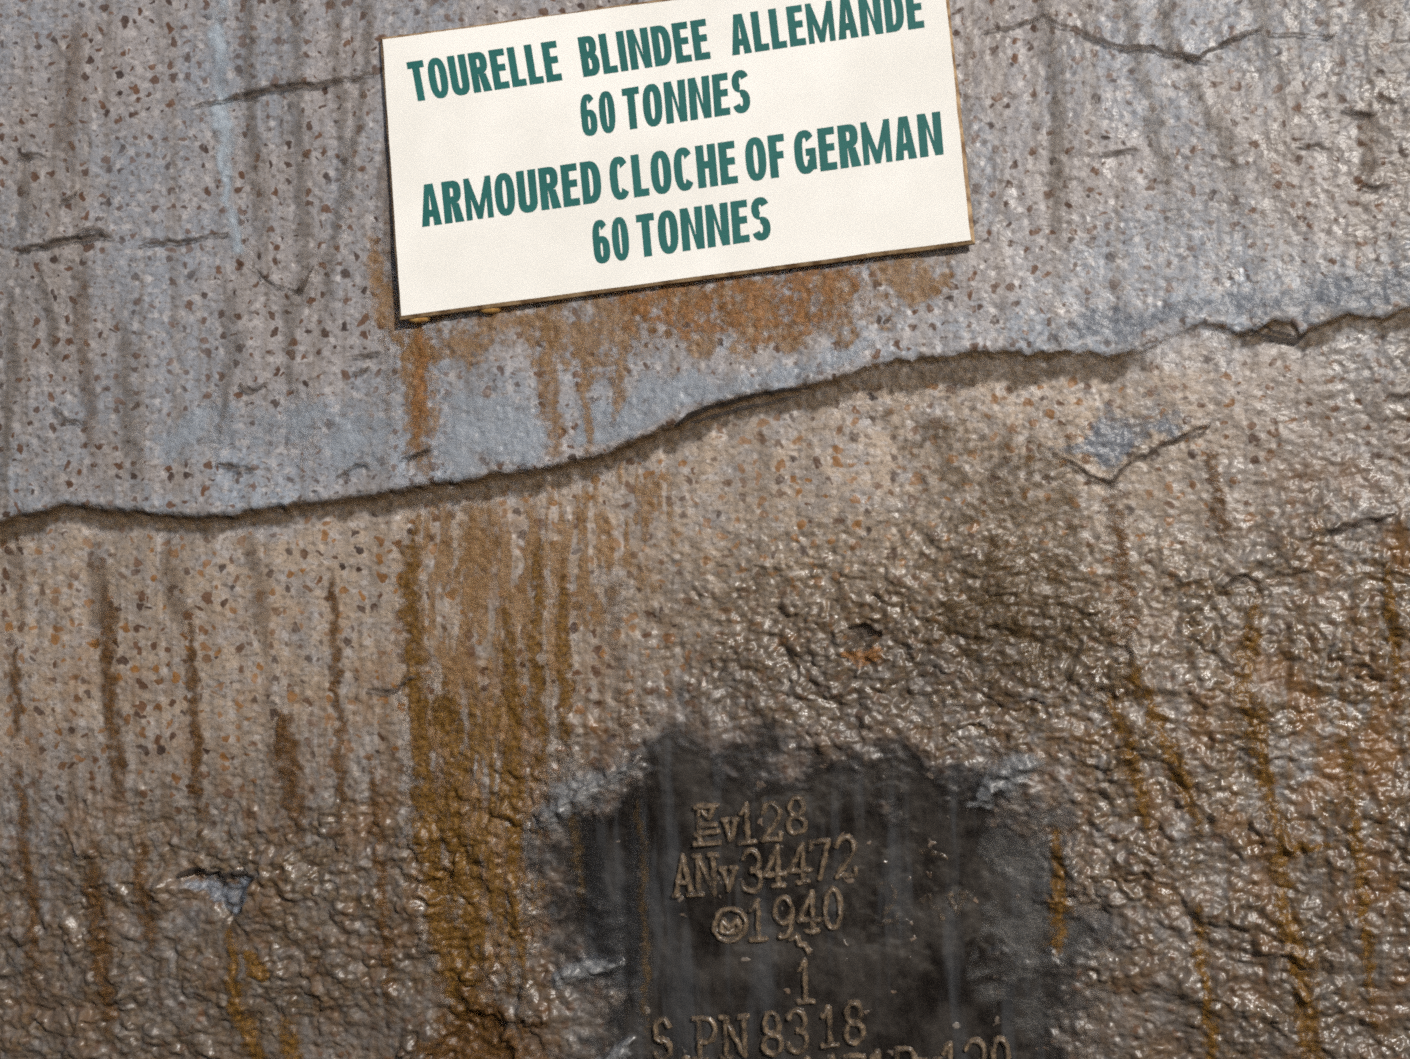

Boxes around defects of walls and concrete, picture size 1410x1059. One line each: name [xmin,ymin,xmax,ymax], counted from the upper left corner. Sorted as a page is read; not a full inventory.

crack [191,72,374,107]
crack [982,14,1338,63]
crack [0,350,1147,544]
corrosion [367,236,954,474]
crack [1053,423,1211,486]
crack [1187,307,1410,348]
corrosion [97,586,126,791]
corrosion [185,624,209,835]
corrosion [328,581,348,832]
corrosion [398,460,675,1059]
water stain [969,829,1096,1035]
corrosion [1230,602,1377,1059]